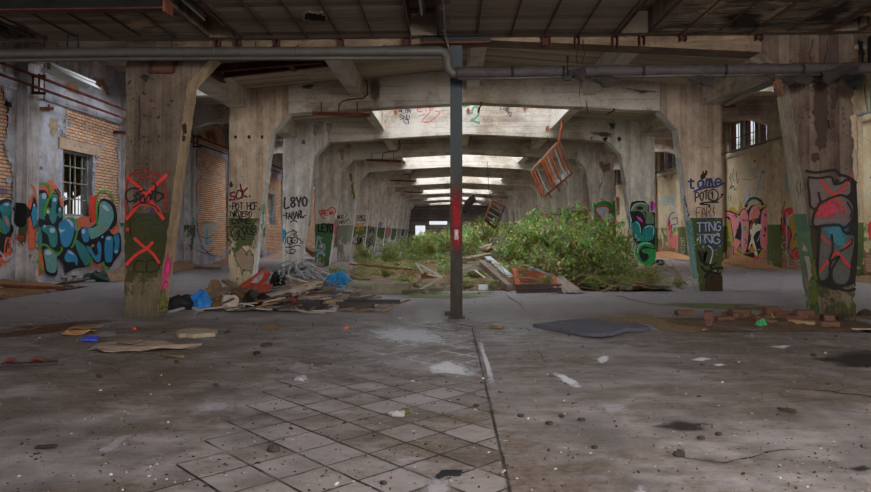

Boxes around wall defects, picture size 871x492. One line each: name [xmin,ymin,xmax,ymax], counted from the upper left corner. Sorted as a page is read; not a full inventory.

spalling [0,86,17,261]
spalling [57,108,121,231]
spalling [136,92,263,275]
peeling [810,82,837,163]
water stain [817,352,871,367]
crack [663,449,797,463]